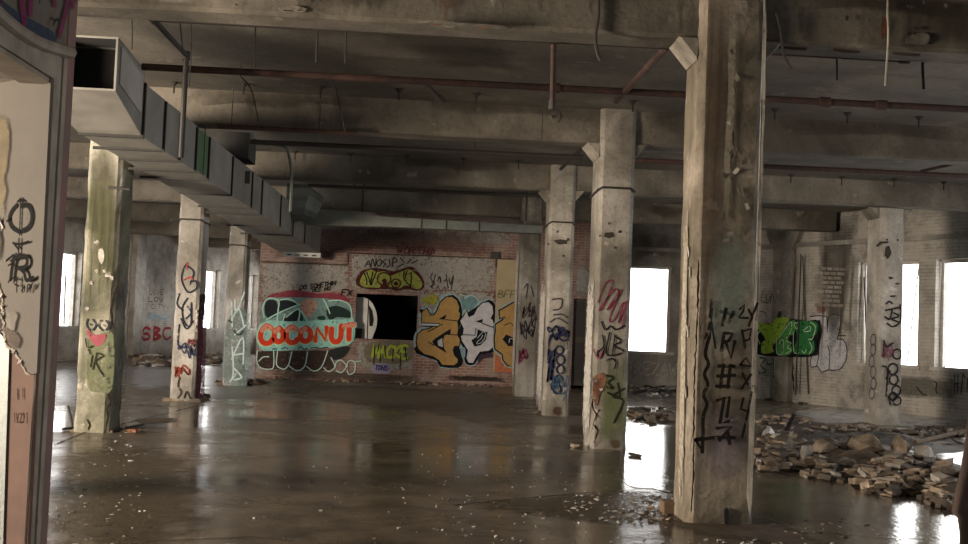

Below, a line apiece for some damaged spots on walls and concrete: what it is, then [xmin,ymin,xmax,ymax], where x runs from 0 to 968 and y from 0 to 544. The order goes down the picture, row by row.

peeling [0,290,30,375]